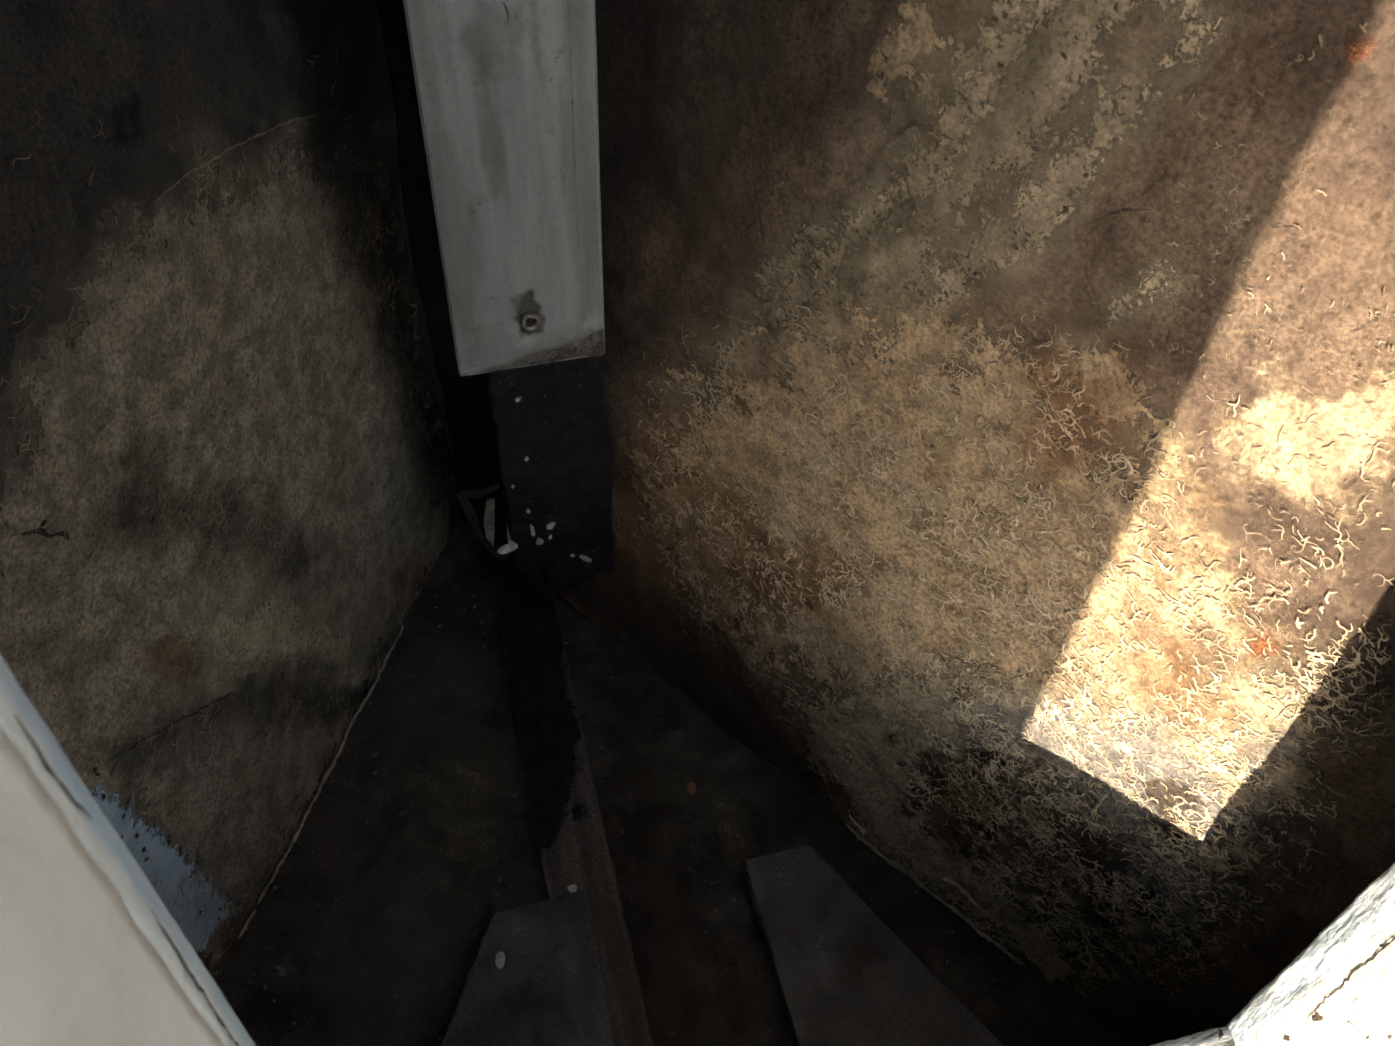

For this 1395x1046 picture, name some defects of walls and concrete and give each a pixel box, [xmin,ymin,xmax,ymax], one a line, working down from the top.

water stain [0,0,508,980]
water stain [595,0,1358,992]